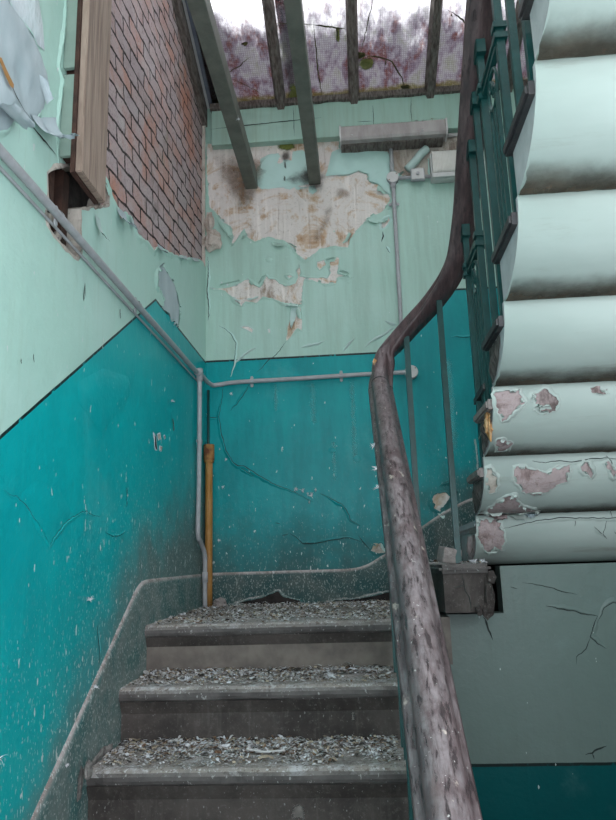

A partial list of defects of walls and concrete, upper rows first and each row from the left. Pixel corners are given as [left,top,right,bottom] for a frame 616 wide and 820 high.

peeling [0,0,80,152]
flaking render [45,0,457,341]
crack [206,259,370,549]
peeling [491,384,561,424]
peeling [475,458,616,556]
crack [512,582,616,663]